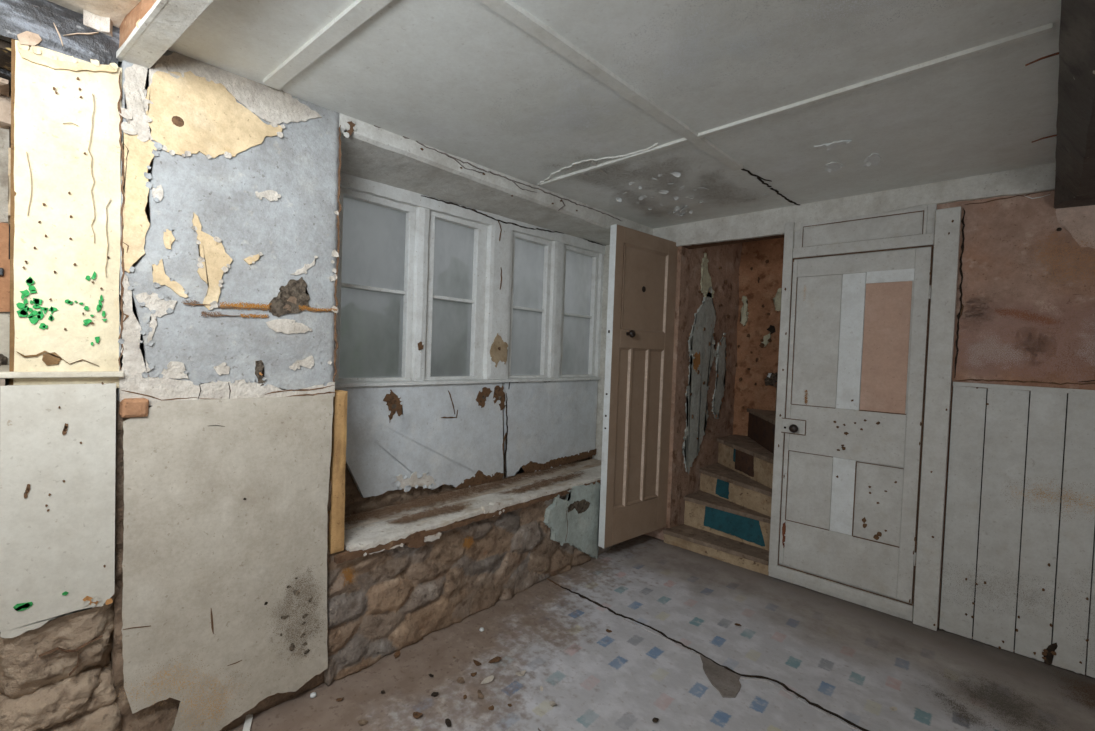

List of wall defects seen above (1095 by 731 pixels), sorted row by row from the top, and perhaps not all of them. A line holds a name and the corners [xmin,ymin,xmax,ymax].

peeling [16,9,357,406]
crack [741,168,800,205]
flaking render [1056,205,1095,249]
peeling [682,253,787,475]
peeling [383,390,403,421]
peeling [476,384,506,412]
flaking render [543,481,601,559]
spalling [13,602,33,611]
peeling [83,596,113,608]
crack [547,578,869,731]